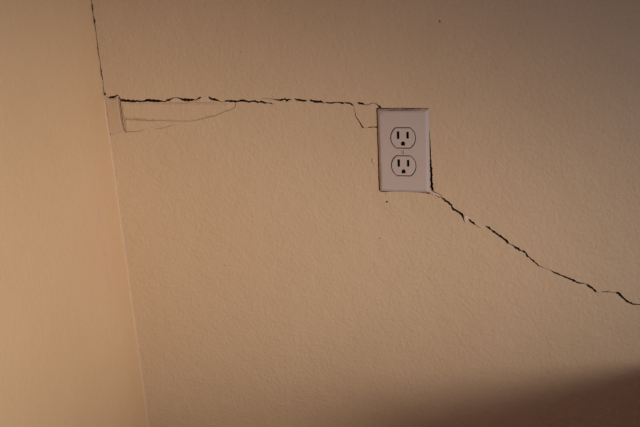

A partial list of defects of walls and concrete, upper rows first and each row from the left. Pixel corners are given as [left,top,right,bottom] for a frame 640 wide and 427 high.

crack [91,0,381,132]
crack [429,130,640,305]